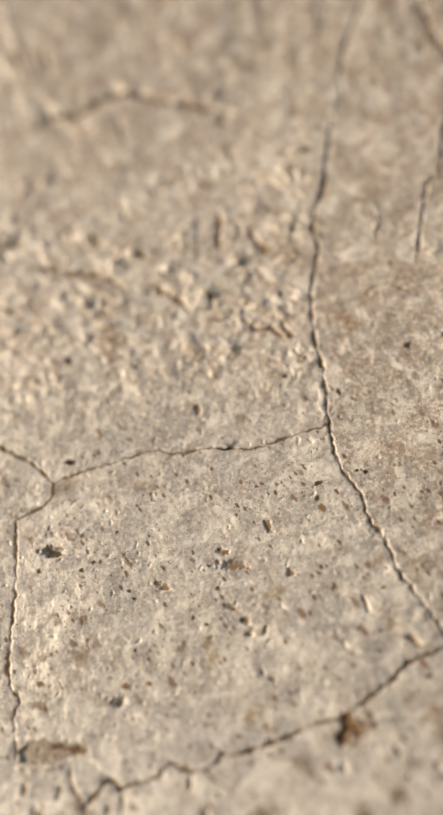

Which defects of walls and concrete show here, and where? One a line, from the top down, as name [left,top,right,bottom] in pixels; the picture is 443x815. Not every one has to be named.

crack [0,63,443,627]
crack [5,588,21,759]
crack [69,648,443,815]